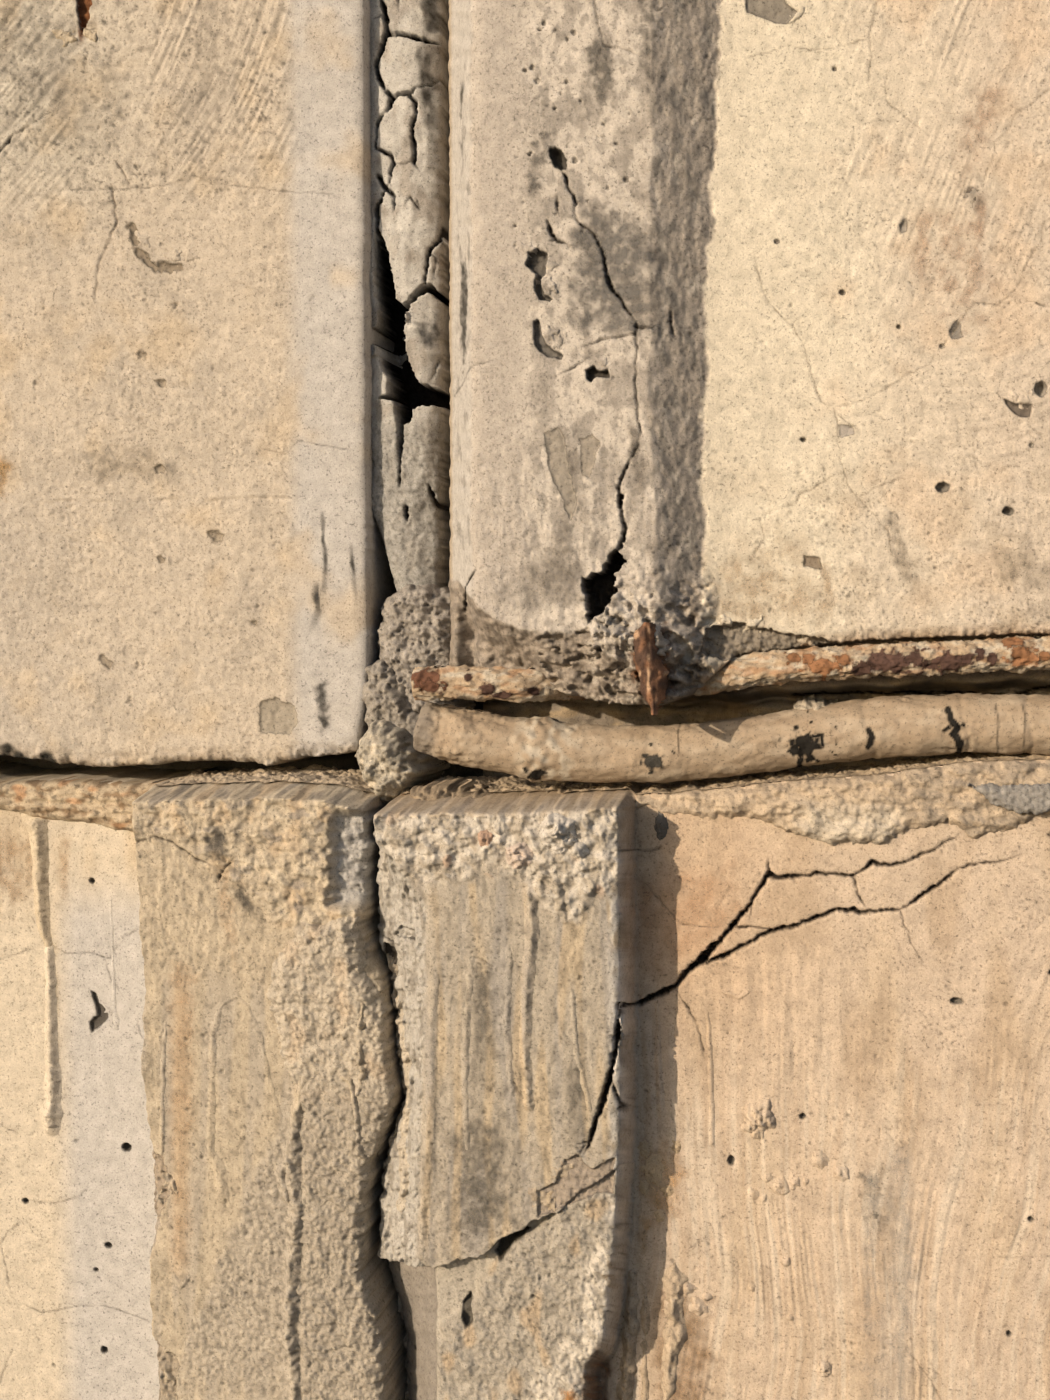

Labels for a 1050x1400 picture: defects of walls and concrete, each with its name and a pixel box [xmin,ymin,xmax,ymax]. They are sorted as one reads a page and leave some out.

peeling [746,0,806,24]
crack [375,0,449,284]
crack [548,174,673,550]
corrosion [411,665,448,694]
corrosion [464,669,540,699]
corrosion [784,637,1050,681]
crack [581,839,1004,1151]